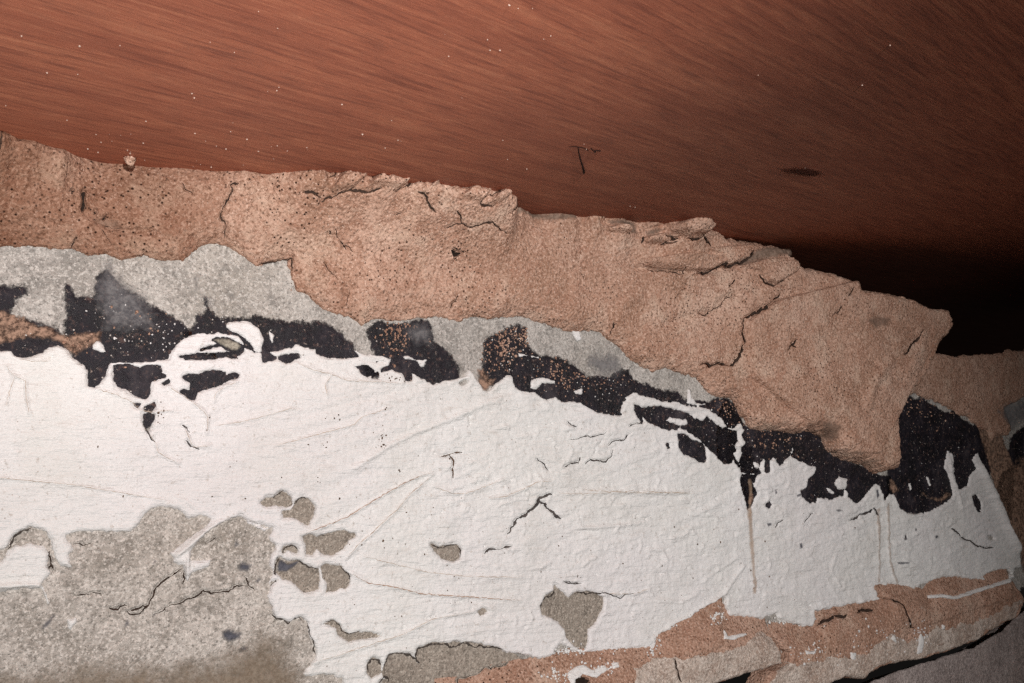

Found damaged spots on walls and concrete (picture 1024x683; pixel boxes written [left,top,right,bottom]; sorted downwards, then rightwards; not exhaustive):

crack [220,183,239,235]
crack [304,173,518,234]
crack [484,422,641,554]
crack [951,528,994,549]
crack [79,568,255,615]
peeling [0,490,355,683]
peeling [540,585,603,649]
spalling [633,599,1023,683]